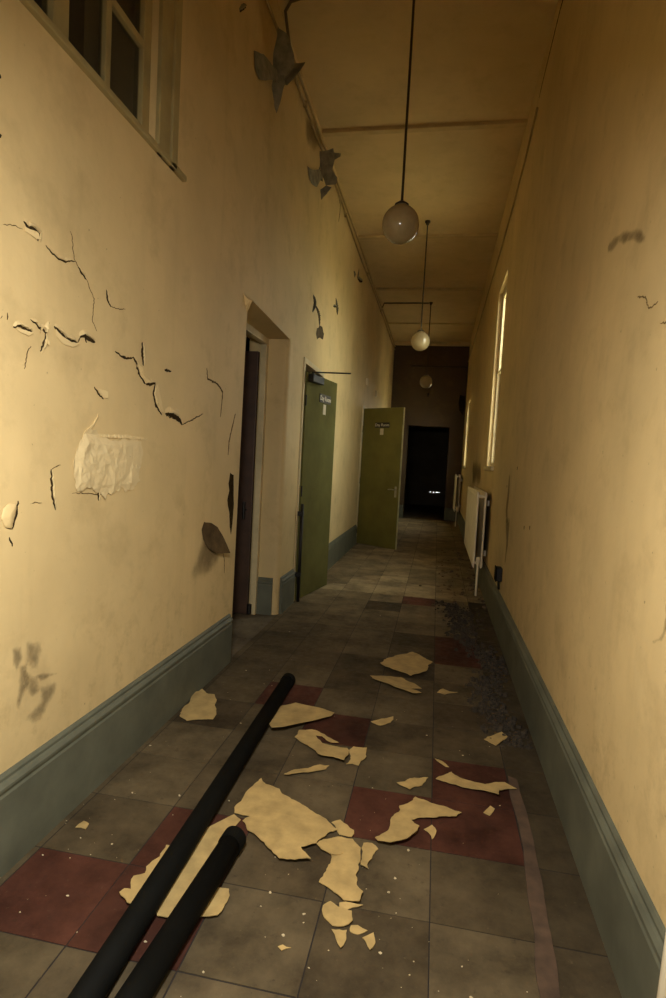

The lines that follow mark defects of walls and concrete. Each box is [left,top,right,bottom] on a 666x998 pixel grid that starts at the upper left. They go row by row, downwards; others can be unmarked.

peeling [254,27,305,113]
peeling [307,148,341,200]
crack [1,219,236,453]